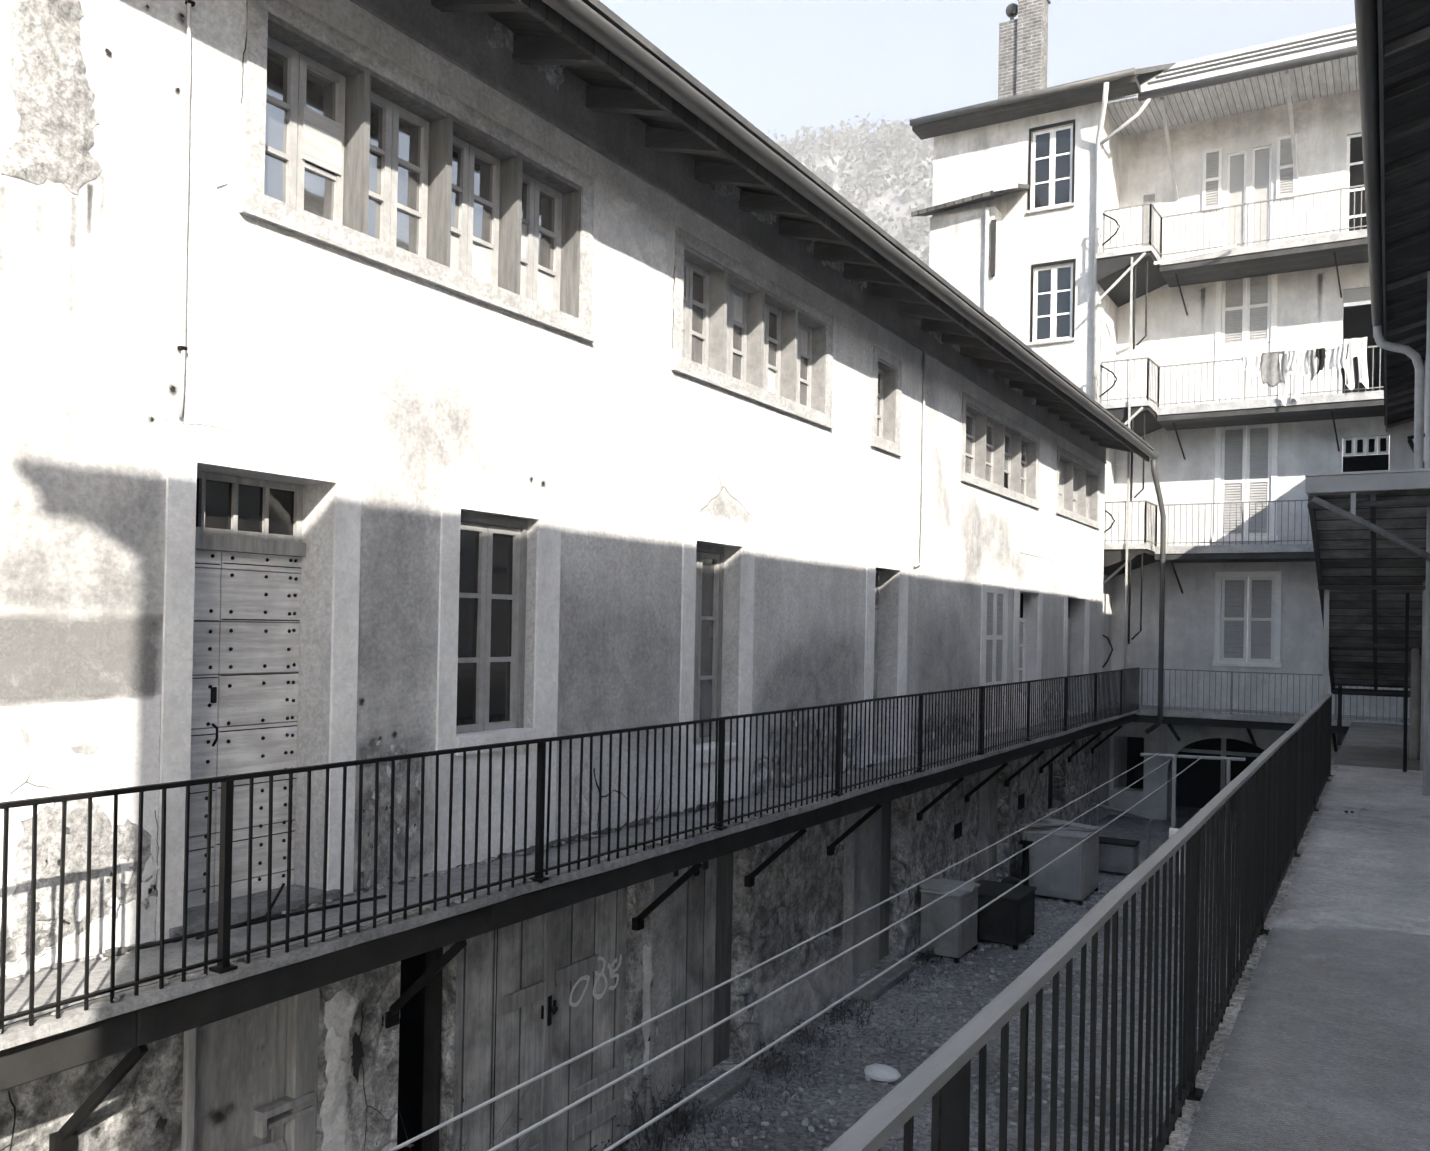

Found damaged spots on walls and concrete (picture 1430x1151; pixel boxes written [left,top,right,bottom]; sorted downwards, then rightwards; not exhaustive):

spalling [1,0,103,219]
spalling [0,799,160,966]
crack [0,1091,16,1151]
spalling [320,988,388,1151]
spalling [380,987,400,1037]